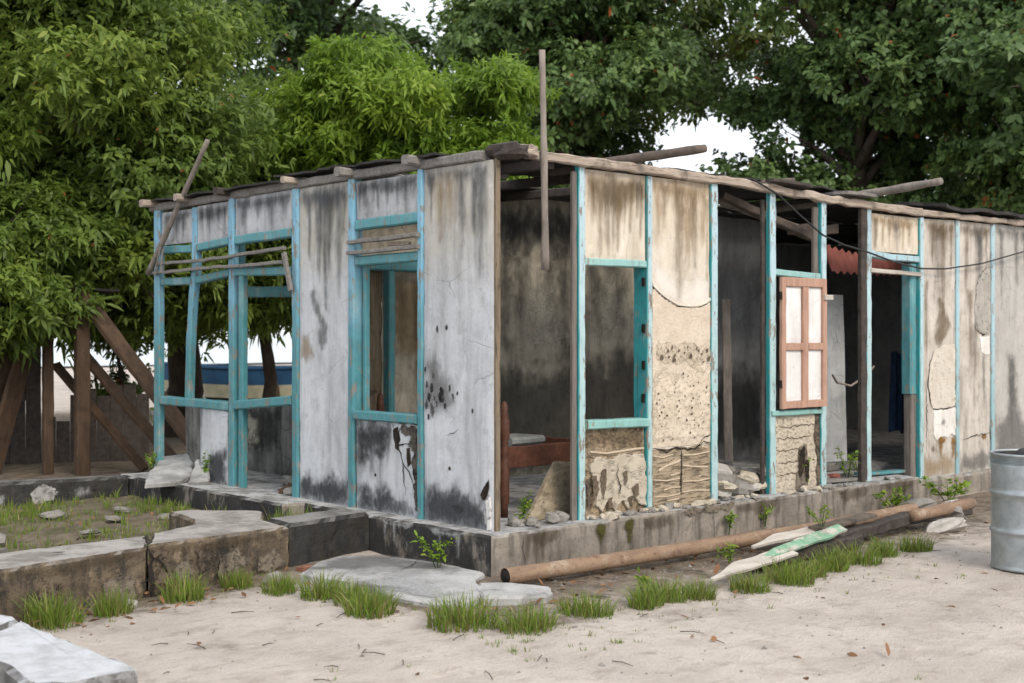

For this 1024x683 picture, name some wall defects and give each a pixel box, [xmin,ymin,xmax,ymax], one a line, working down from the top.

leakage [501,211,571,346]
peeling [974,267,991,355]
peeling [586,283,711,513]
peeling [928,344,956,440]
leakage [357,421,390,462]
crack [392,424,415,494]
spalling [796,414,820,490]
leakage [300,476,412,533]
leakage [424,487,487,547]
crack [143,535,168,597]